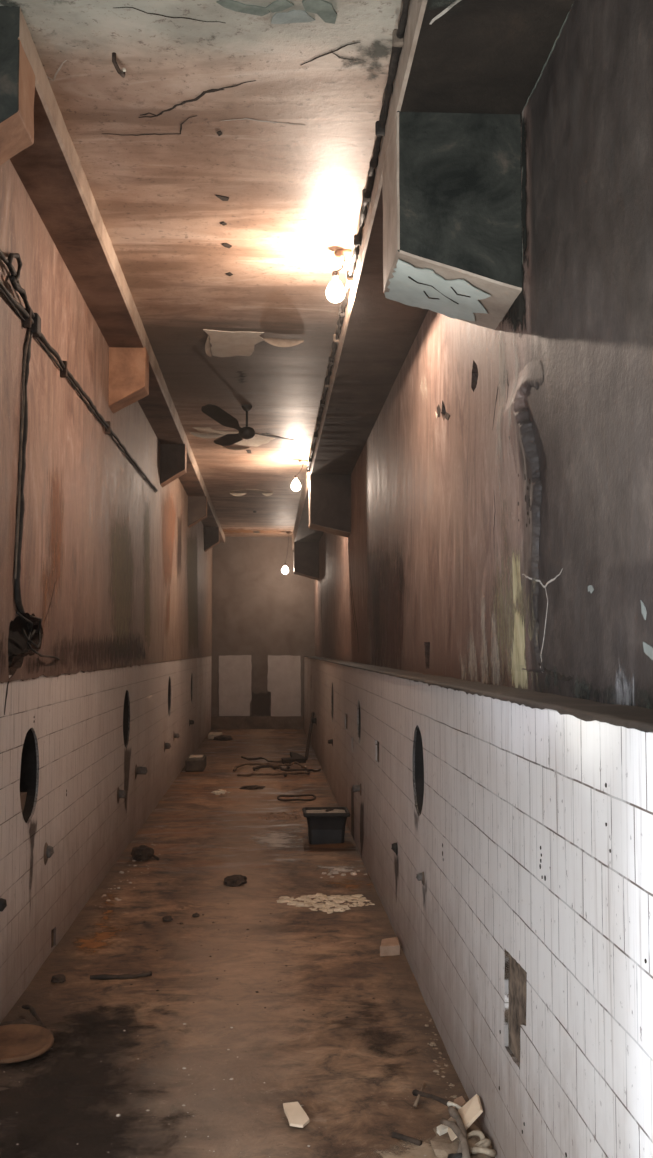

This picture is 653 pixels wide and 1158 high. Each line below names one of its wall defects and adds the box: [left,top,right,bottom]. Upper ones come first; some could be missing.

crack [116,7,225,23]
spalling [216,0,337,24]
crack [113,80,256,136]
peeling [385,259,491,322]
peeling [203,329,304,357]
peeling [499,949,527,1070]